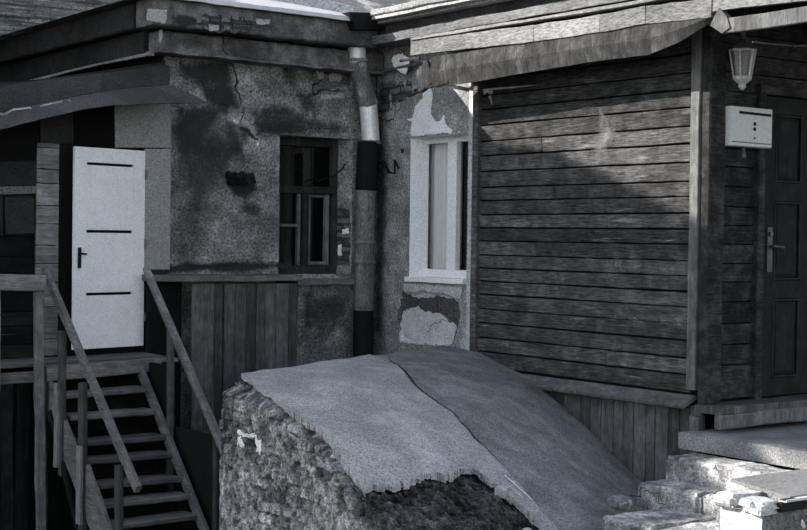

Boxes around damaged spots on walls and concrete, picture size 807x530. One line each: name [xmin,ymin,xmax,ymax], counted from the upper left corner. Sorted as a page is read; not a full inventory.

crack [222,36,278,140]
leakage [254,95,339,135]
flaking render [376,77,413,122]
peeling [407,88,460,136]
leakage [176,62,247,249]
leakage [229,184,259,215]
flaking render [397,283,462,346]